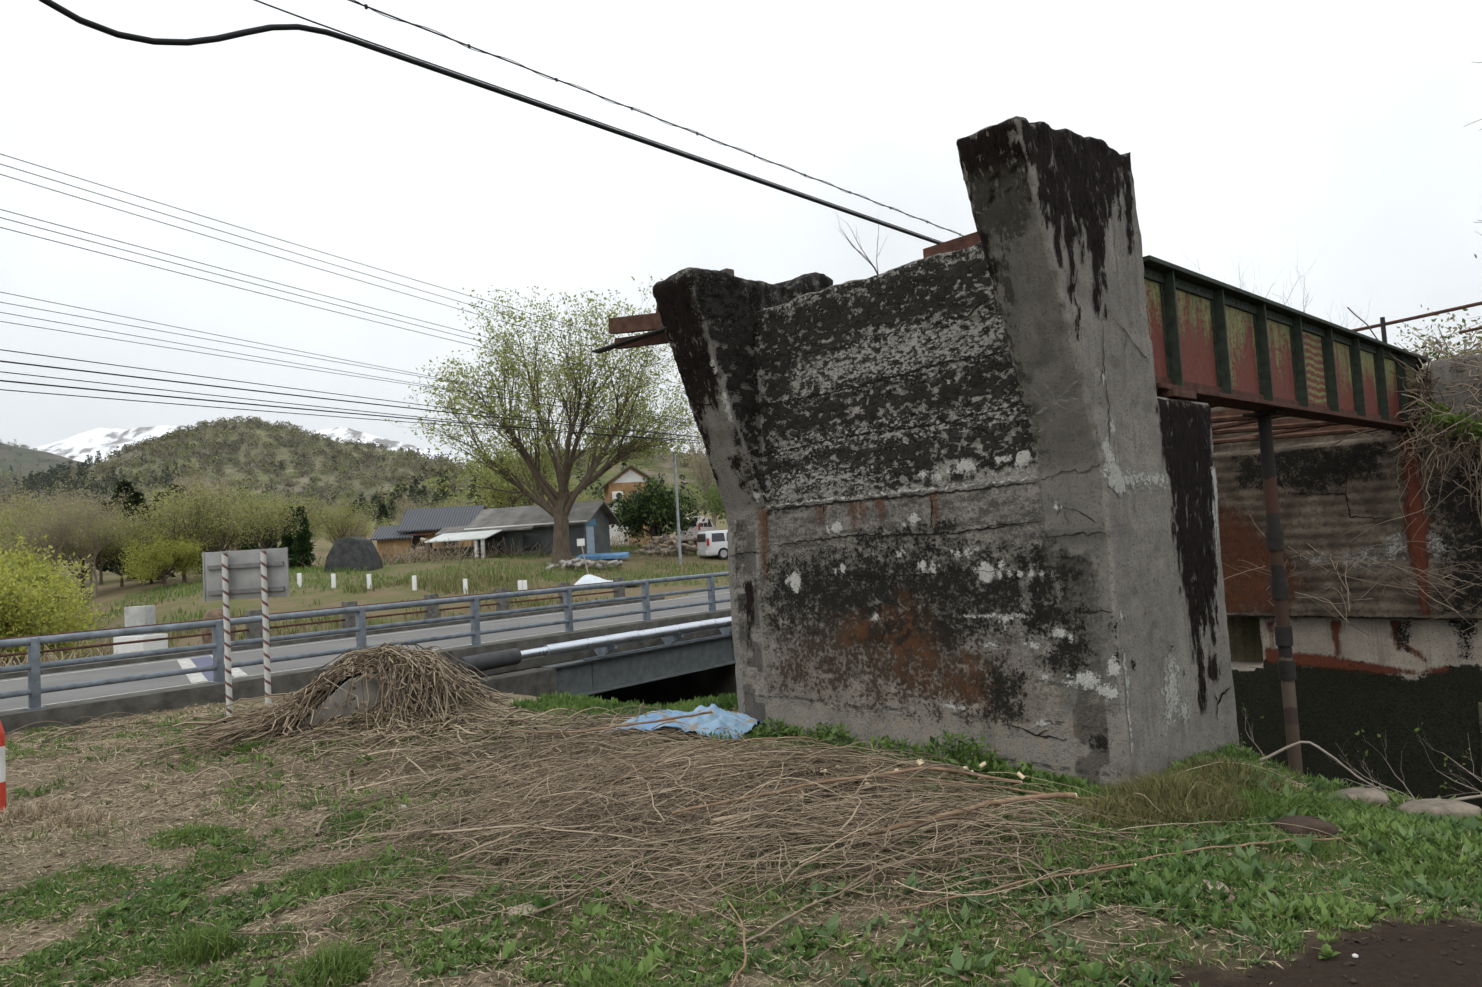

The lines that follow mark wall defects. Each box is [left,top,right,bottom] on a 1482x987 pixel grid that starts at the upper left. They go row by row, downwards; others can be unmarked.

damp [653,119,1134,515]
damp [743,517,1121,730]
damp [1089,734,1108,751]
damp [1109,391,1482,809]